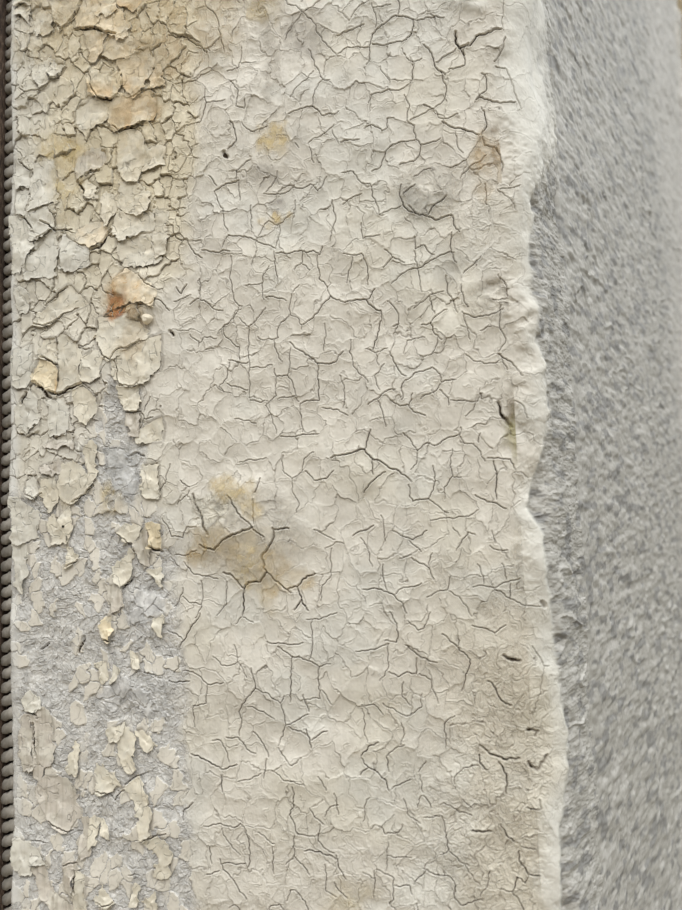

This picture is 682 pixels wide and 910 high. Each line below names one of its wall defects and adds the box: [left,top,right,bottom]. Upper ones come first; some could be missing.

crack [57,3,111,34]
crack [21,383,81,403]
crack [39,288,150,428]
spalling [7,0,191,910]
corrosion [110,282,135,318]
crack [117,0,539,910]